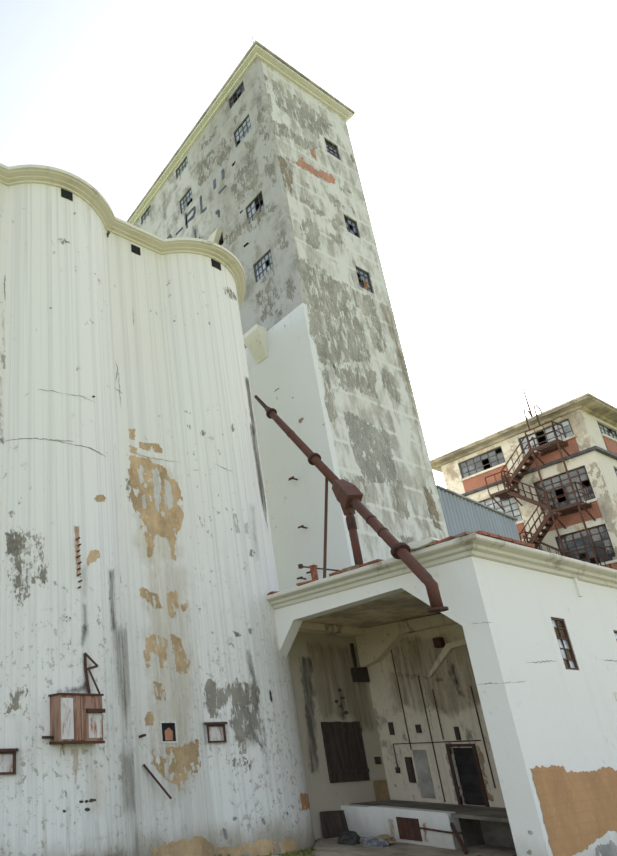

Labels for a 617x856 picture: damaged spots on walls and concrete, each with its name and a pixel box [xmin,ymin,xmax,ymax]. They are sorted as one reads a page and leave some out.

peeling [197,75,355,249]
peeling [125,429,184,561]
peeling [139,587,201,618]
peeling [143,634,190,674]
peeling [153,681,166,700]
peeling [151,739,201,791]
peeling [530,765,617,856]
spalling [150,827,297,856]